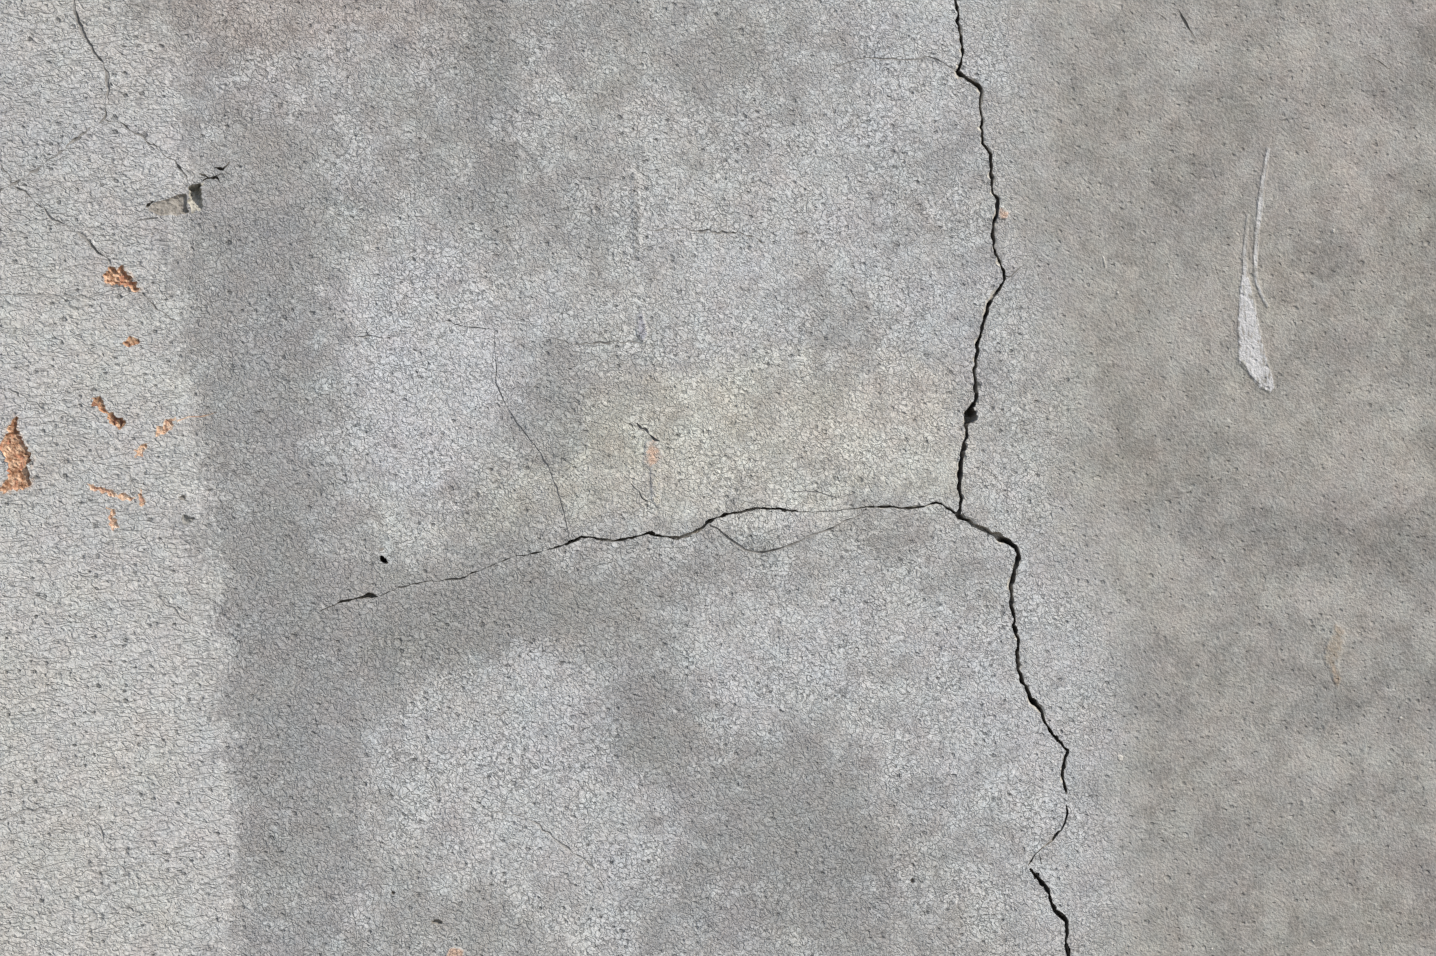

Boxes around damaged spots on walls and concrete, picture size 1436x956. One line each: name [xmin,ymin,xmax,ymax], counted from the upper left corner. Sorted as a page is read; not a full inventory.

peeling [97,258,148,300]
peeling [122,336,140,347]
peeling [91,396,126,430]
peeling [0,407,42,500]
peeling [134,417,176,458]
crack [319,0,1070,956]
peeling [87,483,146,530]